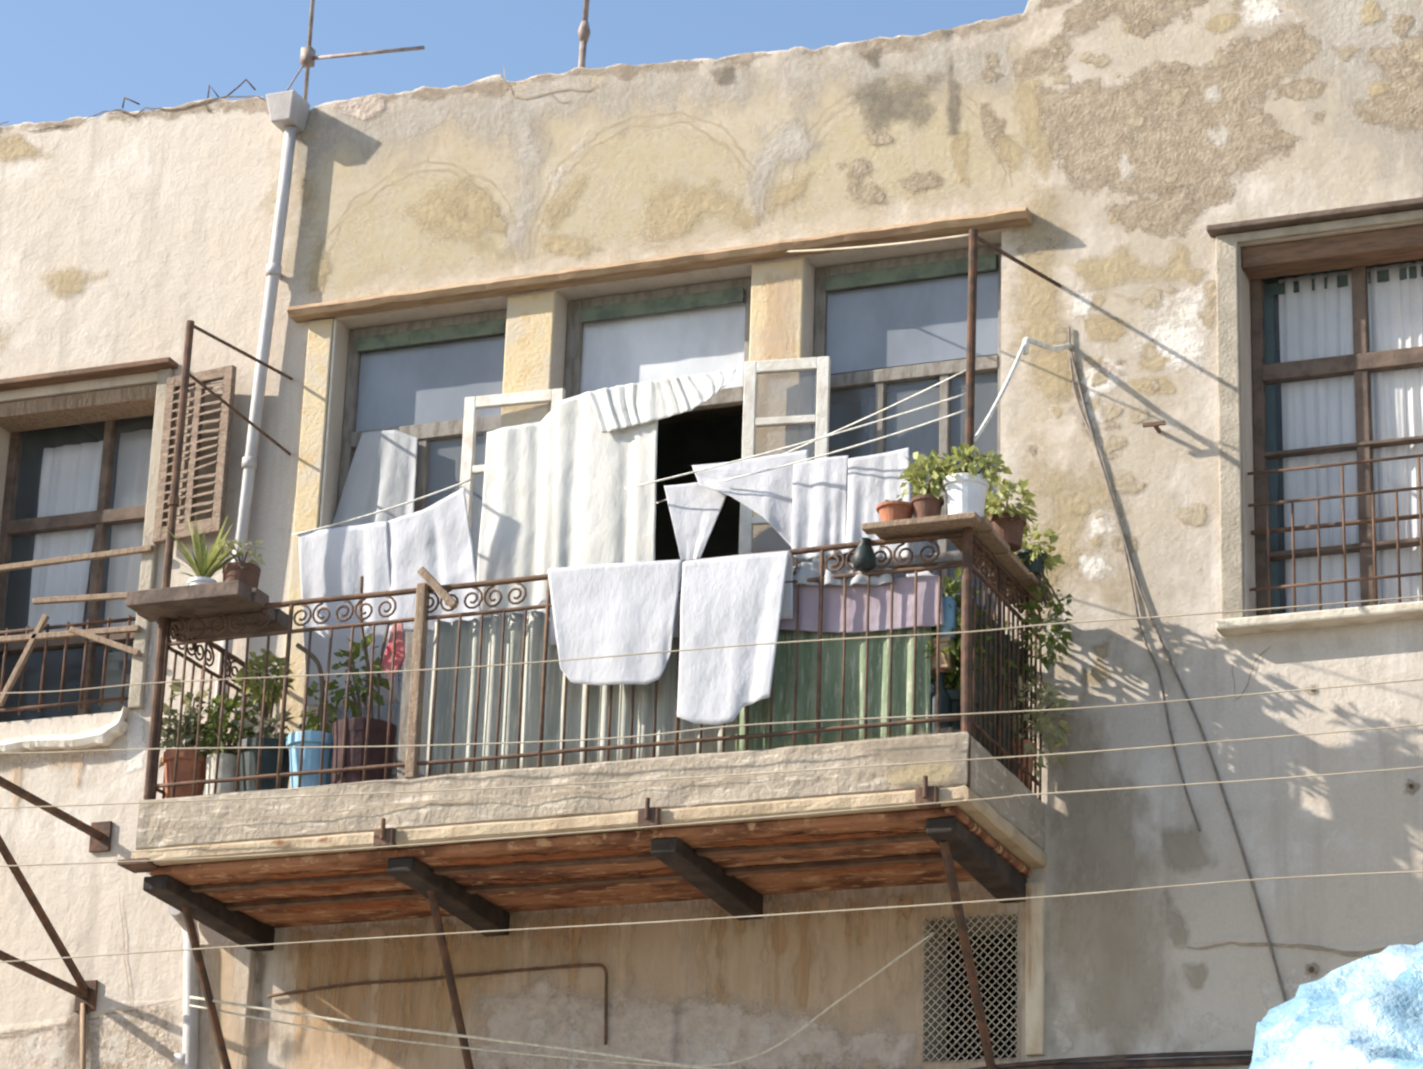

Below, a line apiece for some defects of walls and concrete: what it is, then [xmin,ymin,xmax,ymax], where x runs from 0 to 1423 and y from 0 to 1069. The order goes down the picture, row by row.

leakage [0,134,37,159]
leakage [417,110,592,256]
leakage [648,121,812,241]
peeling [899,171,941,194]
peeling [981,0,1423,464]
leakage [47,269,85,295]
peeling [1042,503,1137,586]
peeling [1177,503,1206,526]